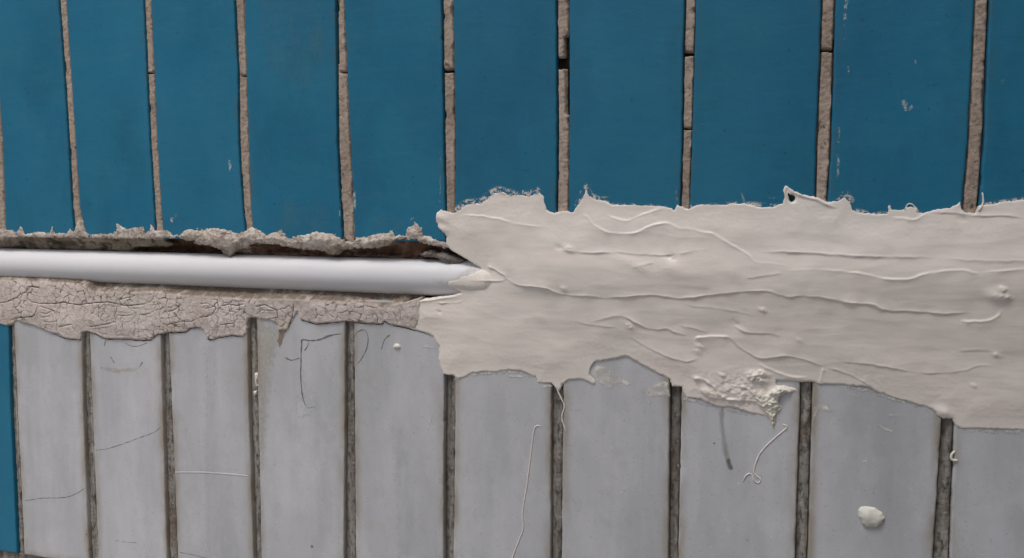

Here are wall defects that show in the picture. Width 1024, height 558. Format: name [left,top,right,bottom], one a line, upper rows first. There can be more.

spalling [0,220,467,264]
crack [1,286,404,337]
peeling [0,276,426,340]